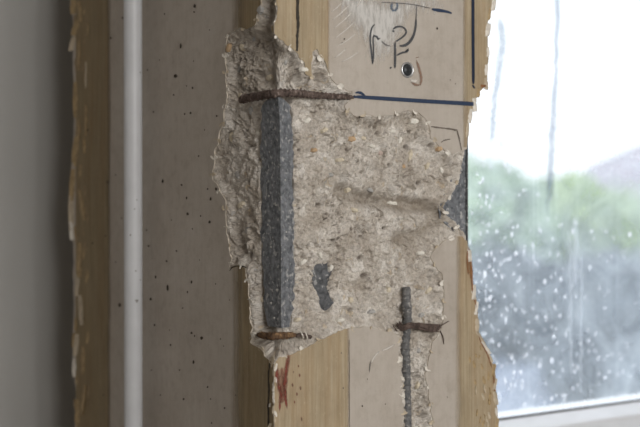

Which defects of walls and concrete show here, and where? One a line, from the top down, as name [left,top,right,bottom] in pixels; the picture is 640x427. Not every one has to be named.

spalling [207,0,466,427]